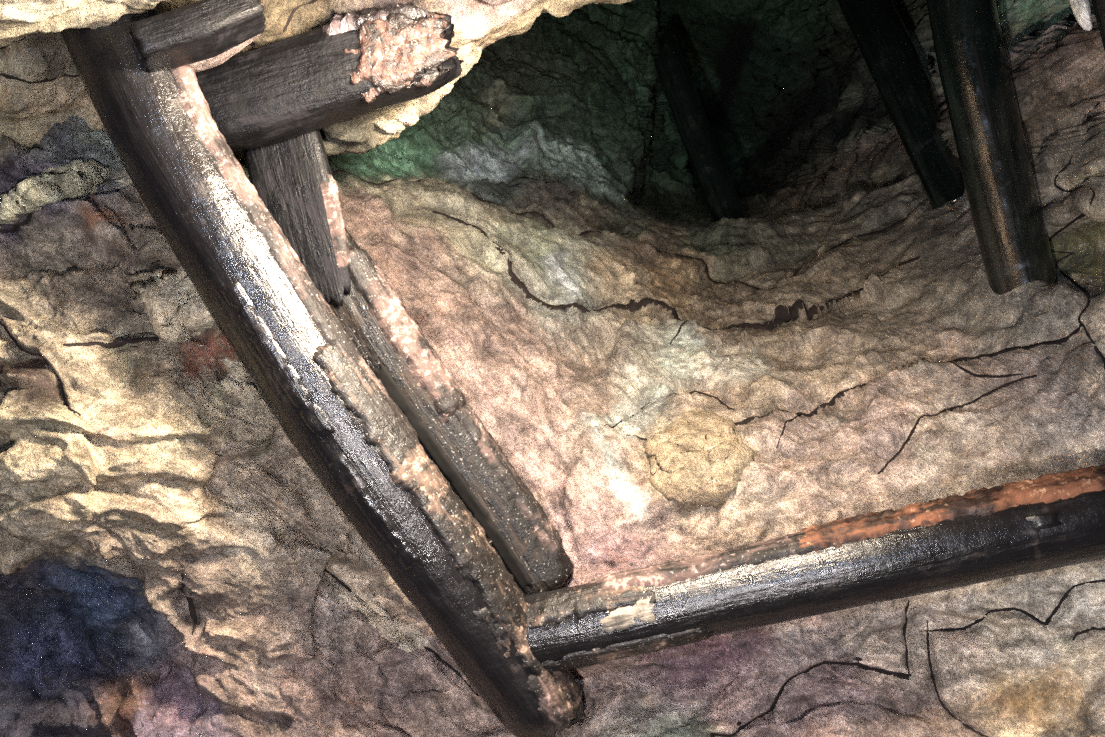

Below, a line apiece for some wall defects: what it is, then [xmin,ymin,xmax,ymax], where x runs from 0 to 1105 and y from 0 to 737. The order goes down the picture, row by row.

crack [432,191,863,344]
crack [877,156,1105,474]
crack [603,383,867,448]
crack [710,579,1105,737]